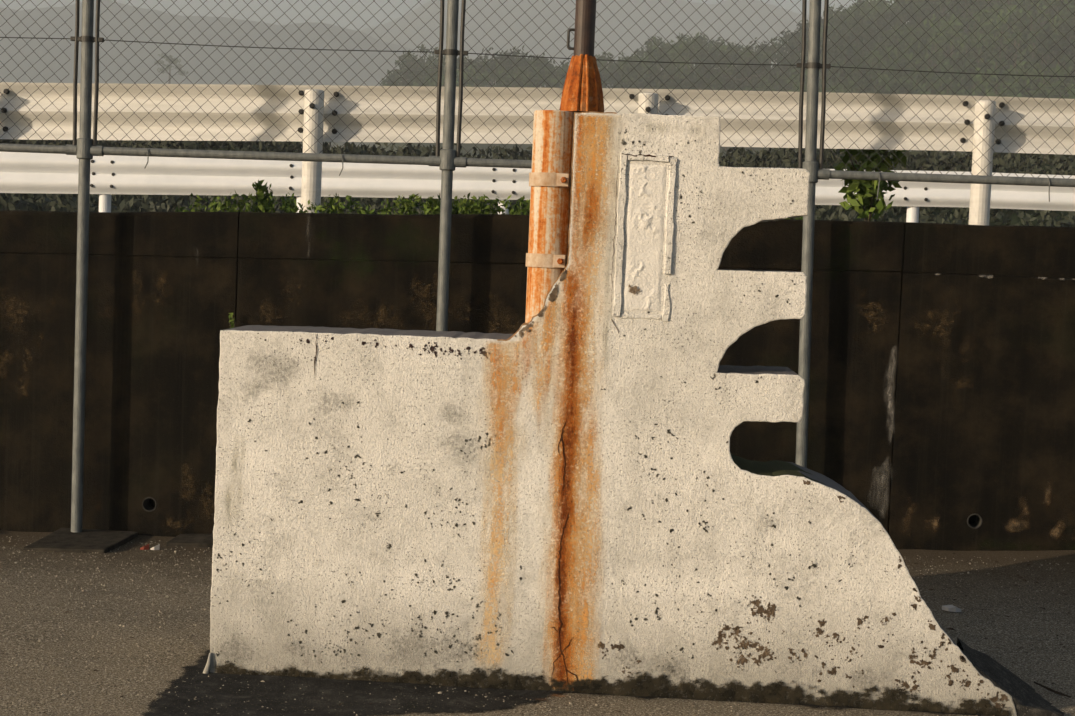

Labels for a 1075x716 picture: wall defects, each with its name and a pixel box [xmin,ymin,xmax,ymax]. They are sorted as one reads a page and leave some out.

spalling [515,269,567,337]
corrosion [484,116,609,689]
leakage [887,348,895,429]
crack [551,422,578,683]